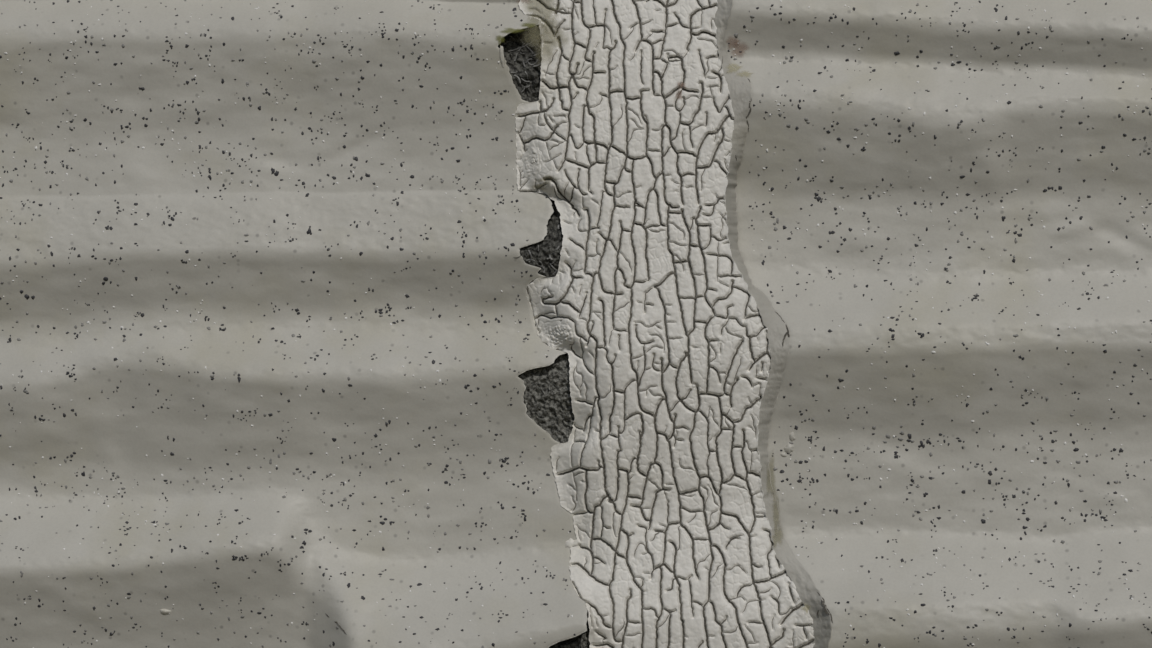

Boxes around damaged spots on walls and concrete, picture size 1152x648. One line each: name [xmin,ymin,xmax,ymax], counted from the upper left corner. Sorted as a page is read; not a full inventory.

crack [518,0,813,648]